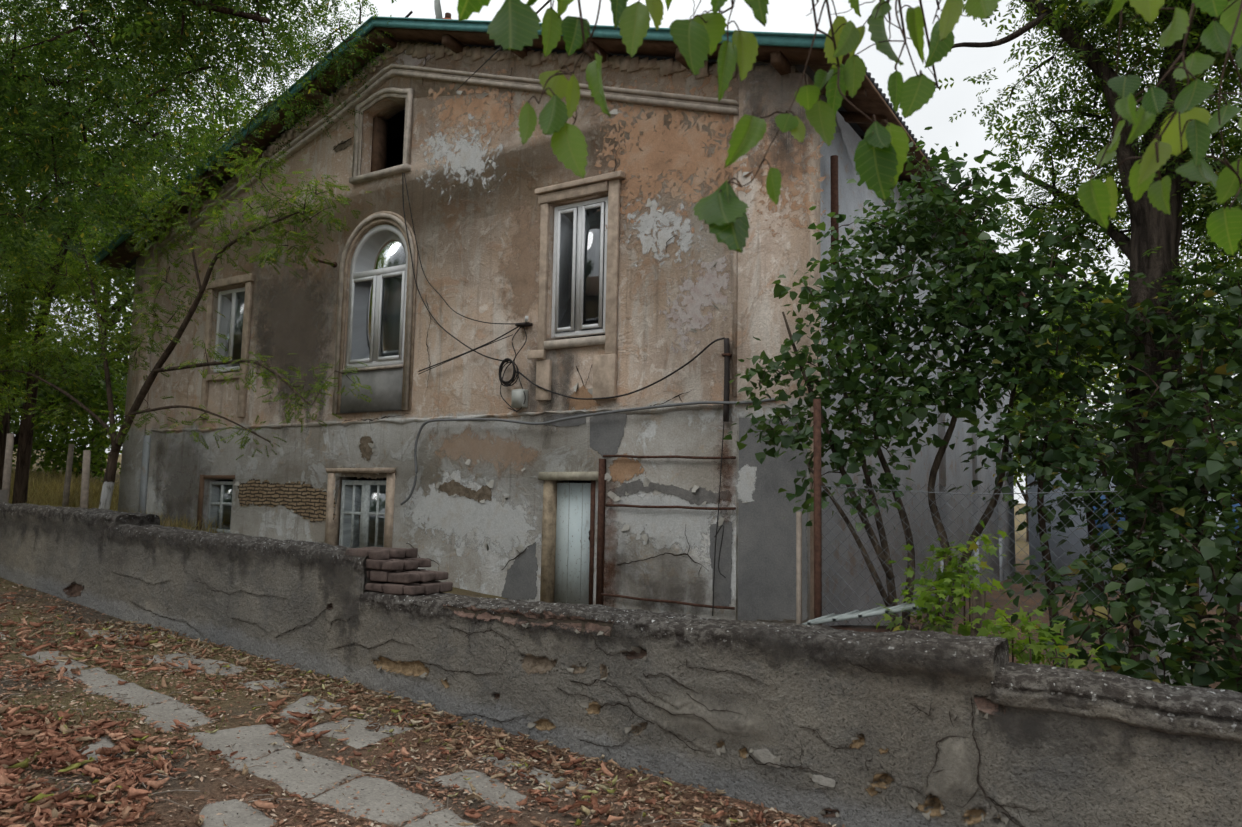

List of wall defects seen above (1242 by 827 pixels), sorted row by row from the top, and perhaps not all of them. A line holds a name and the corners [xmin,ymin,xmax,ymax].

peeling [416,66,530,202]
peeling [595,72,826,353]
spalling [234,478,336,522]
spalling [337,436,397,479]
peeling [400,468,542,564]
peeling [605,453,757,566]
spalling [371,656,449,688]
crack [557,635,768,753]
crack [746,727,873,787]
crack [907,697,1037,827]